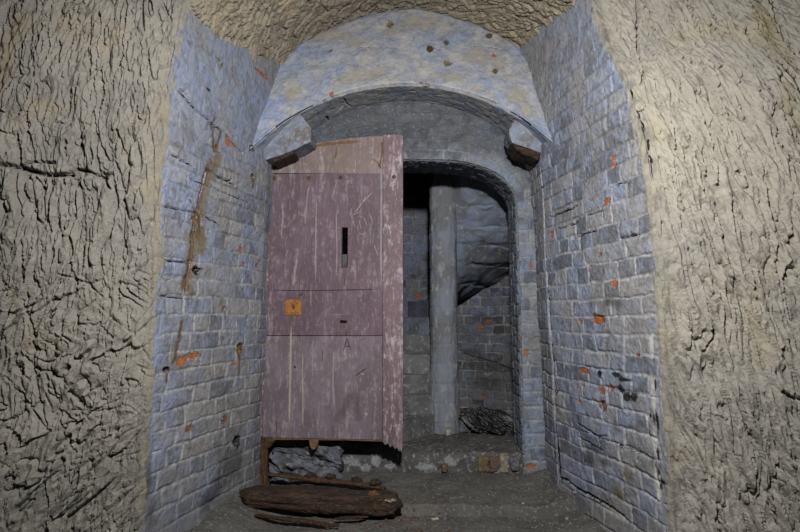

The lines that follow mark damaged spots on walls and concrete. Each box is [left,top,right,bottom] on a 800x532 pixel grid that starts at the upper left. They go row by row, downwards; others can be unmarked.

crack [630,5,653,177]
crack [1,162,110,188]
rust [181,116,222,300]
crack [26,307,82,439]
water stain [612,372,638,401]